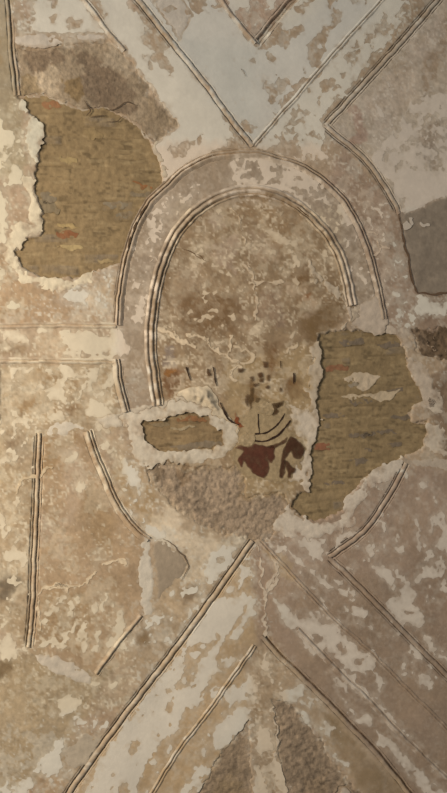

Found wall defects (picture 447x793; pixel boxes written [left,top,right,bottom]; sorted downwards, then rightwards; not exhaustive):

flaking render [0,0,410,324]
peeling [371,93,447,213]
peeling [221,313,266,335]
flaking render [0,328,239,515]
peeling [0,513,28,586]
peeling [142,518,166,541]
flaking render [245,224,447,793]
peeling [0,597,28,662]
peeling [39,593,173,653]
peeling [85,545,288,793]
peeling [58,694,109,731]
peeling [0,737,72,793]